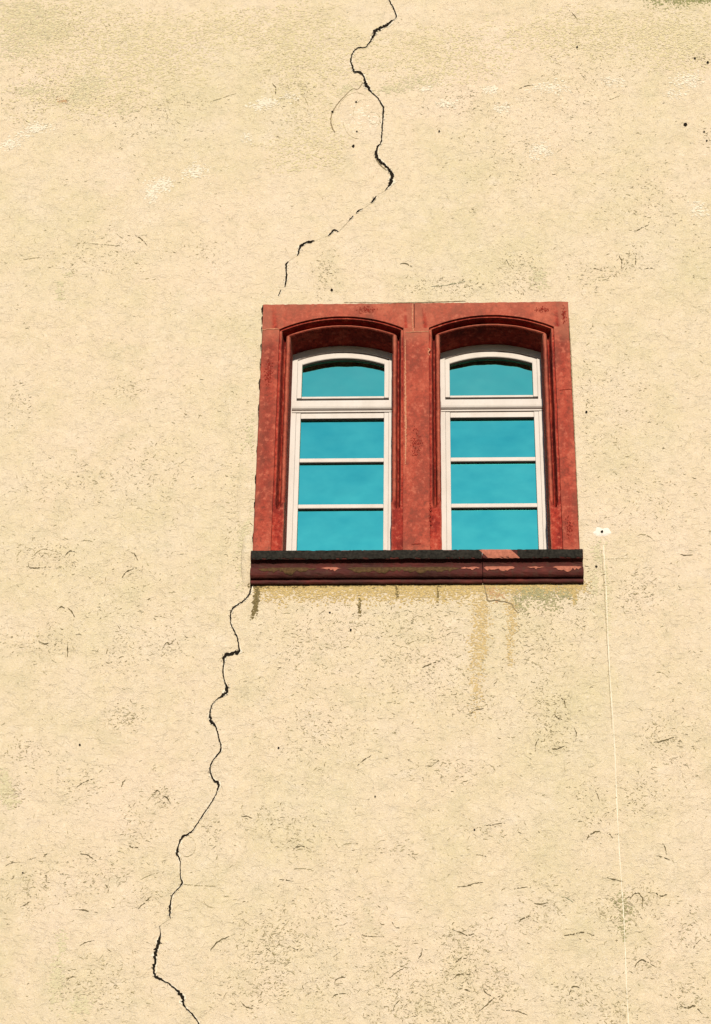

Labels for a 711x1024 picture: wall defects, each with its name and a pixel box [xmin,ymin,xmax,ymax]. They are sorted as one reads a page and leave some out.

crack [258,0,398,410]
crack [138,585,253,1024]
leakage [247,581,592,718]
spalling [462,549,519,571]